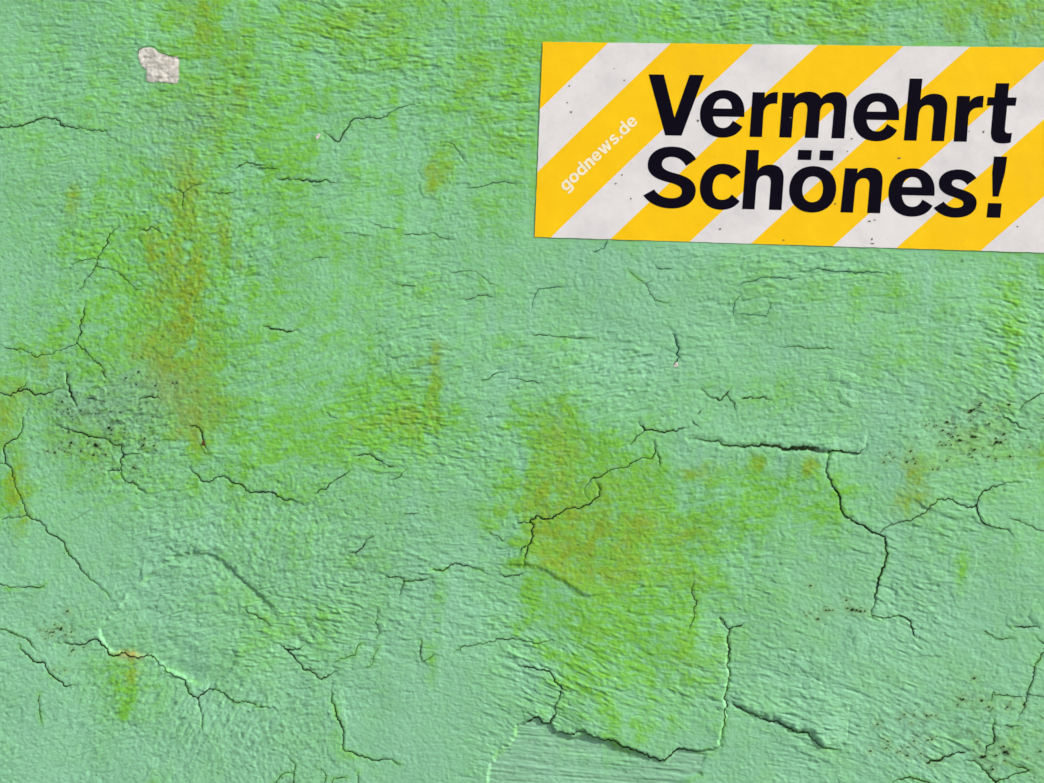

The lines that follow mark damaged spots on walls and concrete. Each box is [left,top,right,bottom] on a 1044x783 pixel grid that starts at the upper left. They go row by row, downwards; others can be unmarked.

peeling [139,47,179,84]
crack [0,226,161,404]
crack [1,421,98,585]
leakage [0,304,464,549]
crack [191,453,406,504]
leakage [426,387,1011,772]
crack [491,390,1044,637]
crack [62,638,267,709]
crack [245,609,393,783]
spalling [486,616,849,783]
crack [691,583,830,749]
crack [893,626,1044,783]